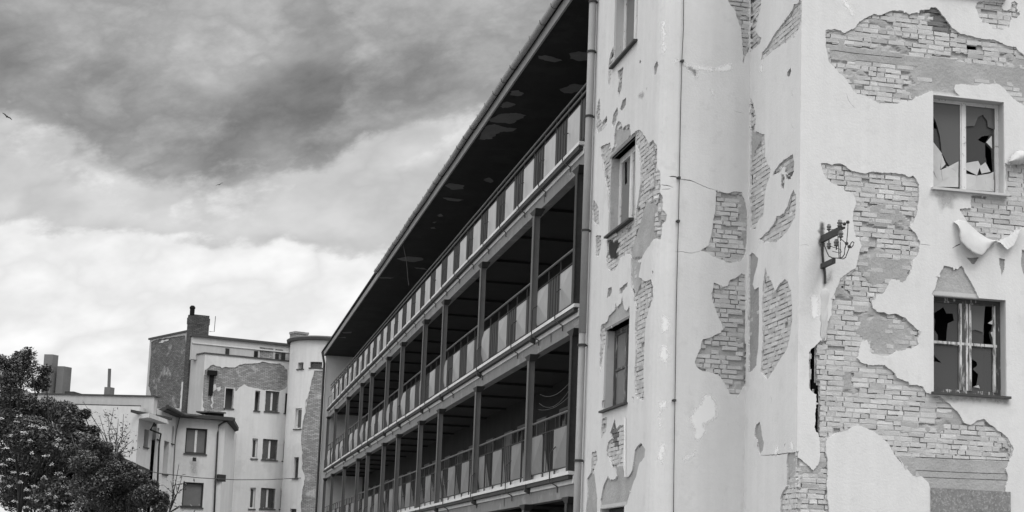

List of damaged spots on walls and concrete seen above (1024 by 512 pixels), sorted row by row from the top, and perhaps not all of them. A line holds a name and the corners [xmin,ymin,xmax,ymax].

spalling [728,0,802,62]
spalling [825,2,1024,105]
spalling [593,50,667,400]
spalling [685,101,796,397]
spalling [203,347,287,412]
spalling [299,371,323,512]
spalling [587,401,645,512]
spalling [781,163,1024,512]